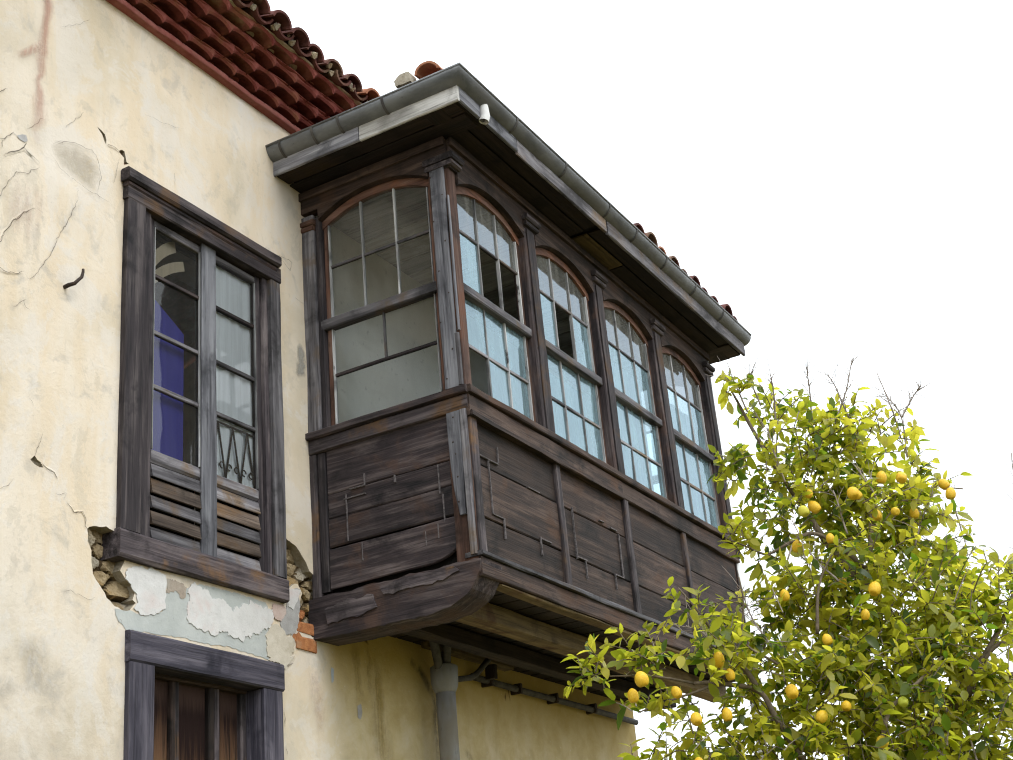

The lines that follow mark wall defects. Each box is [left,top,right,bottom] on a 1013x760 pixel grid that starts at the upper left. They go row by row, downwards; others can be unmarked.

crack [0,114,120,277]
crack [35,441,88,529]
peeling [87,526,317,660]